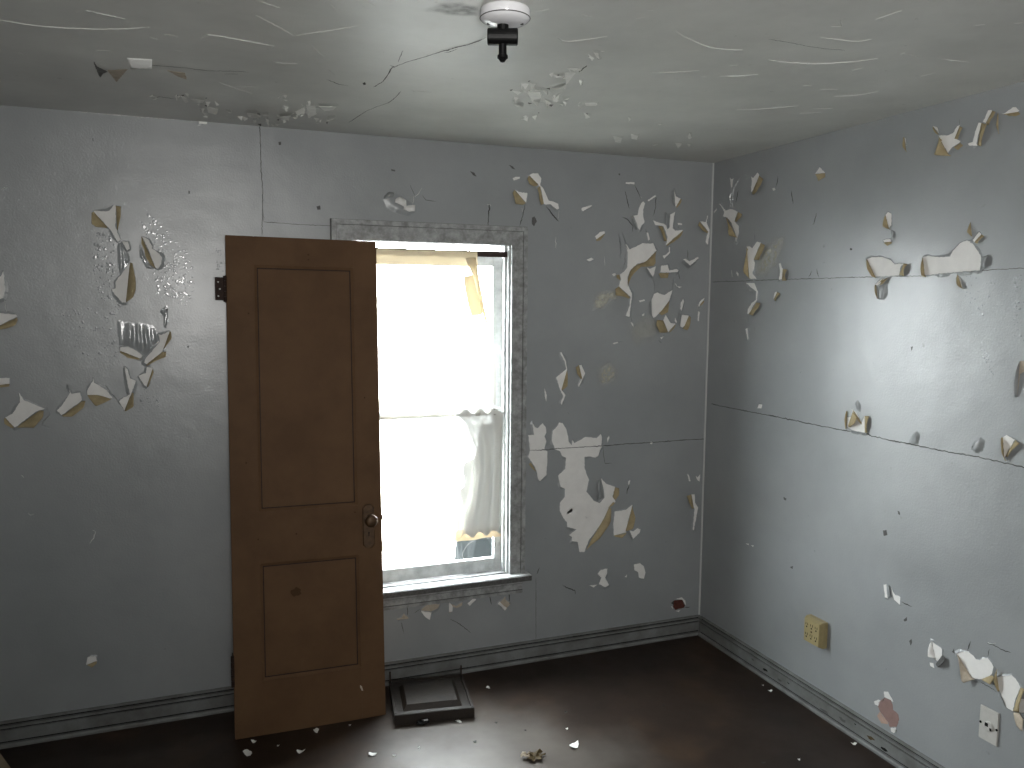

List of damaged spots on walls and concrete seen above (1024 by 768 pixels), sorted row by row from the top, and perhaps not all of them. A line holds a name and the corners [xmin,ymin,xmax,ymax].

crack [329,39,482,122]
peeling [933,106,1021,156]
peeling [509,165,560,226]
peeling [91,205,166,306]
peeling [612,187,705,340]
peeling [718,172,778,341]
peeling [865,212,907,300]
peeling [921,222,988,289]
peeling [0,330,172,431]
crack [713,404,1024,468]
peeling [526,421,641,552]
peeling [928,638,1024,731]